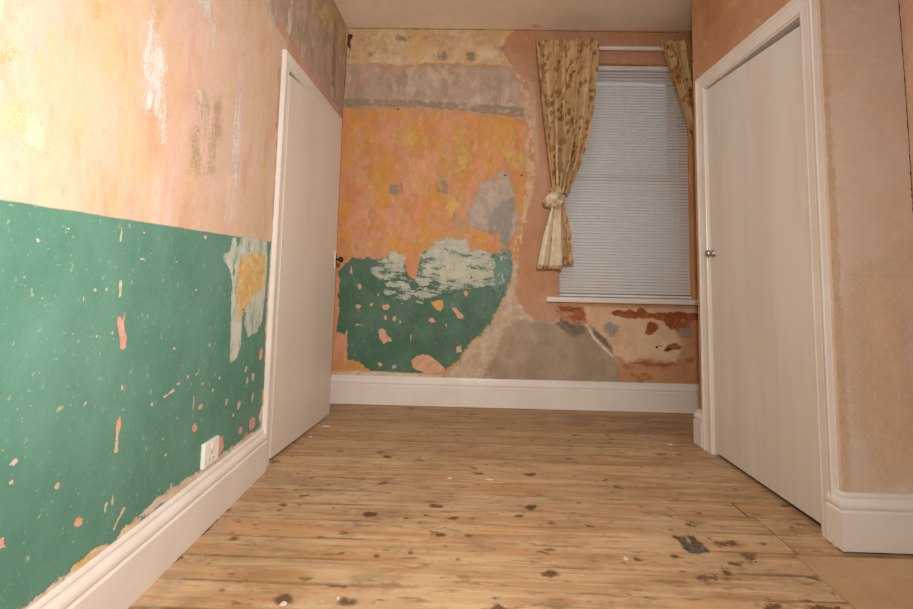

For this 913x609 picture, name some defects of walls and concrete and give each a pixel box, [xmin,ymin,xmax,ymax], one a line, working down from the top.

peeling [223,235,272,437]
peeling [266,0,537,374]